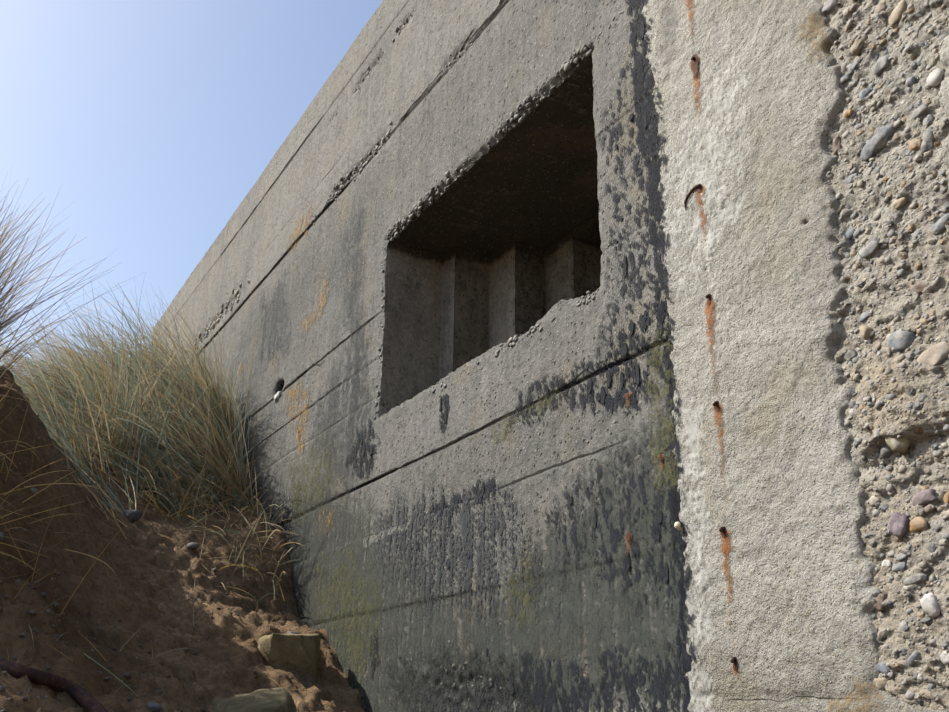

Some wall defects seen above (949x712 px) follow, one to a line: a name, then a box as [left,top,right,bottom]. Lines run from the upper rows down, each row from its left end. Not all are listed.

corrosion [690,54,700,107]
corrosion [684,184,706,231]
corrosion [704,294,716,346]
spalling [818,0,949,711]
corrosion [712,401,723,452]
water stain [261,219,691,712]
corrosion [719,526,732,598]